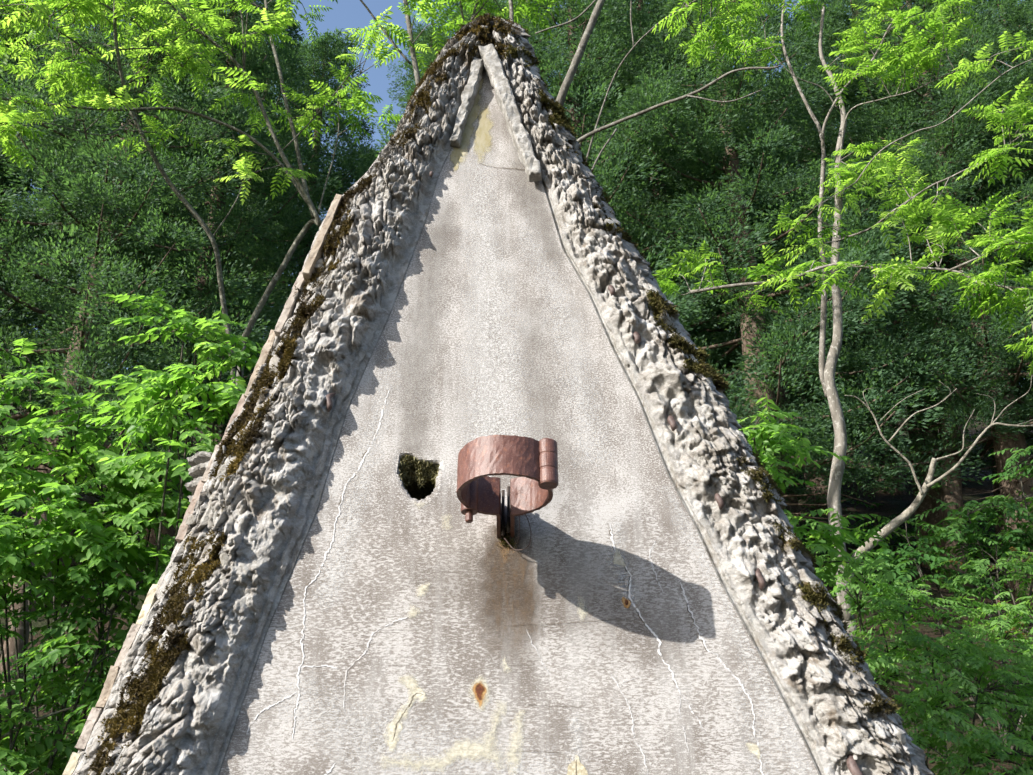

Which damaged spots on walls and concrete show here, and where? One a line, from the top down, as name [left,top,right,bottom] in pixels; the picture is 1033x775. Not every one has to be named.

damp [450,78,524,439]
spalling [391,446,446,508]
crack [246,391,411,739]
damp [485,523,536,641]
peeling [384,676,426,751]
rust [471,678,488,710]
peeling [567,755,588,775]
crack [607,524,764,775]